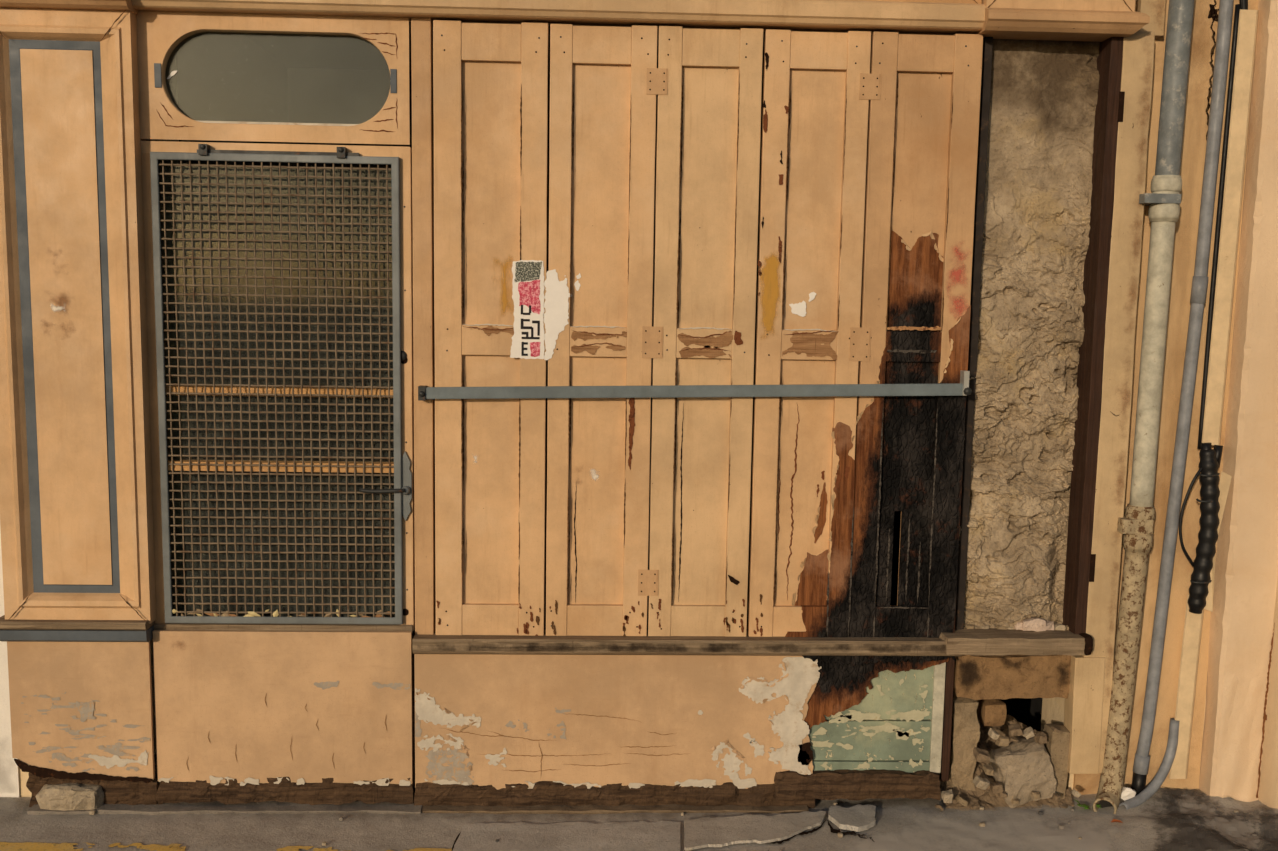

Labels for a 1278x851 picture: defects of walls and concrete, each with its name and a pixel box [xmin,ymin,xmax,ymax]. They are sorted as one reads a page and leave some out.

peeling [571,326,627,355]
peeling [677,327,743,358]
peeling [782,329,839,360]
peeling [778,405,807,606]
peeling [812,465,850,561]
peeling [14,692,173,783]
peeling [209,775,259,786]
peeling [354,682,507,786]
peeling [553,781,601,789]
peeling [674,657,932,789]